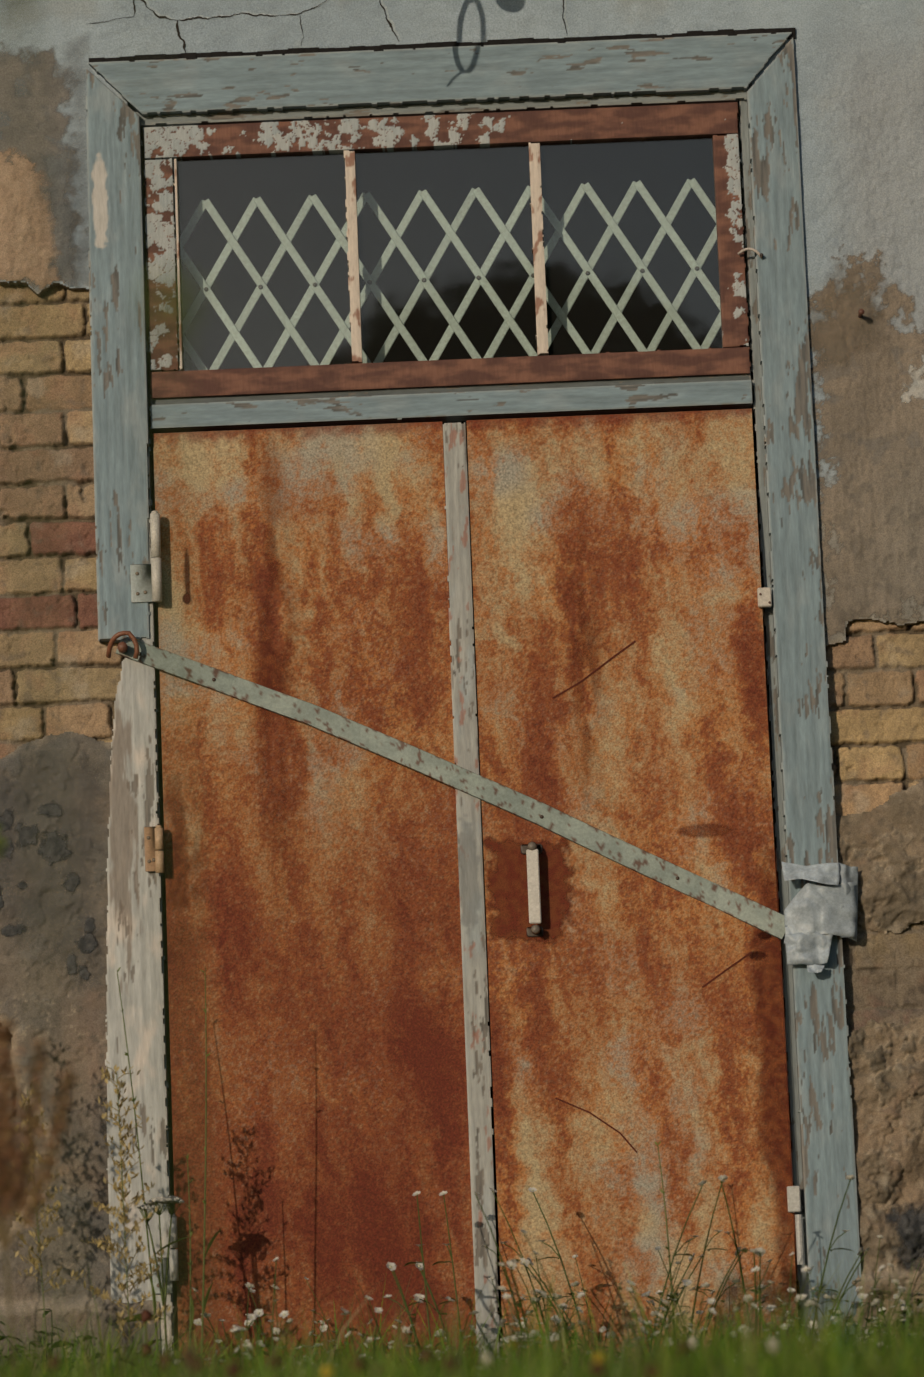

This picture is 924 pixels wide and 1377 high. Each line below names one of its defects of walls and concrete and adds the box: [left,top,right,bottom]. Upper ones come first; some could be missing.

crack [88,0,328,53]
crack [379,0,402,41]
crack [561,0,569,33]
flaking render [0,284,126,759]
corrosion [183,551,191,604]
peeling [807,244,924,816]
corrosion [262,624,285,693]
corrosion [165,811,185,907]
corrosion [483,837,574,943]
corrosion [750,931,795,1276]